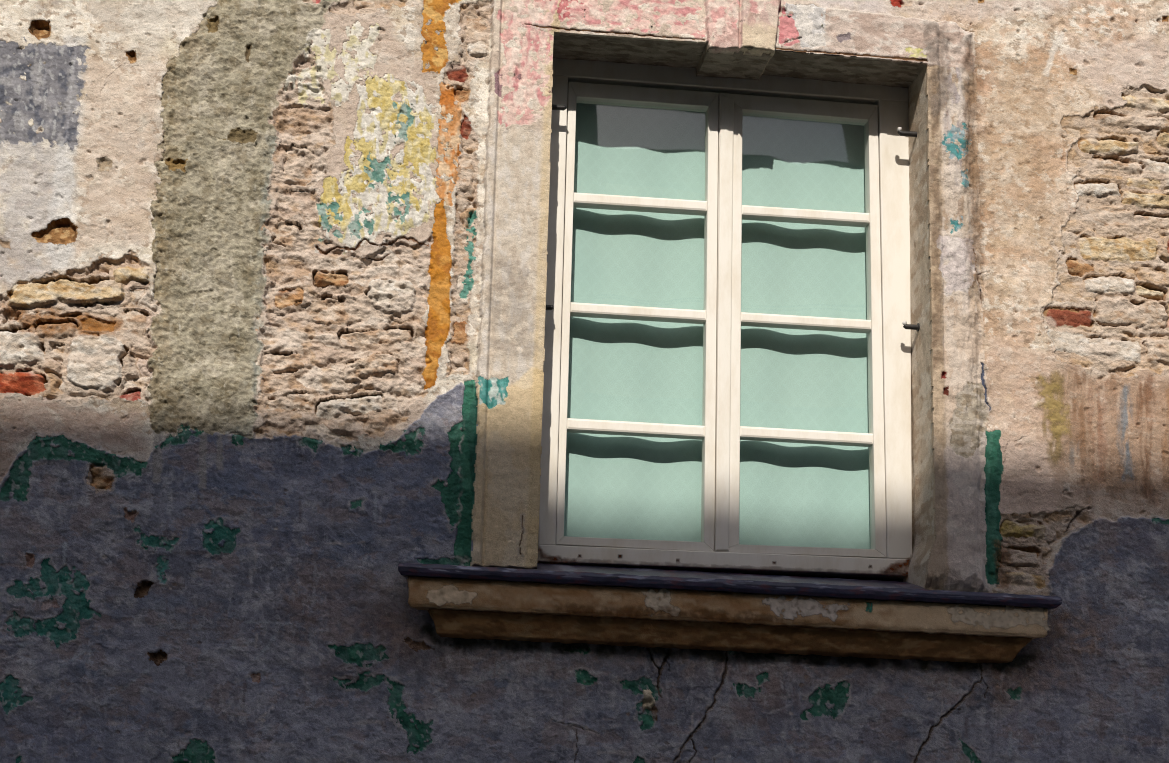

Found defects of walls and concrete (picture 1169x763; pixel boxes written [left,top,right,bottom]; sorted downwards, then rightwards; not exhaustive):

flaking render [223,128,258,145]
flaking render [0,250,162,407]
flaking render [232,0,800,566]
flaking render [1039,84,1169,384]
damp [1038,372,1085,462]
peeling [202,518,241,556]
flaking render [941,372,1093,593]
crack [674,651,729,763]
crack [914,663,990,763]